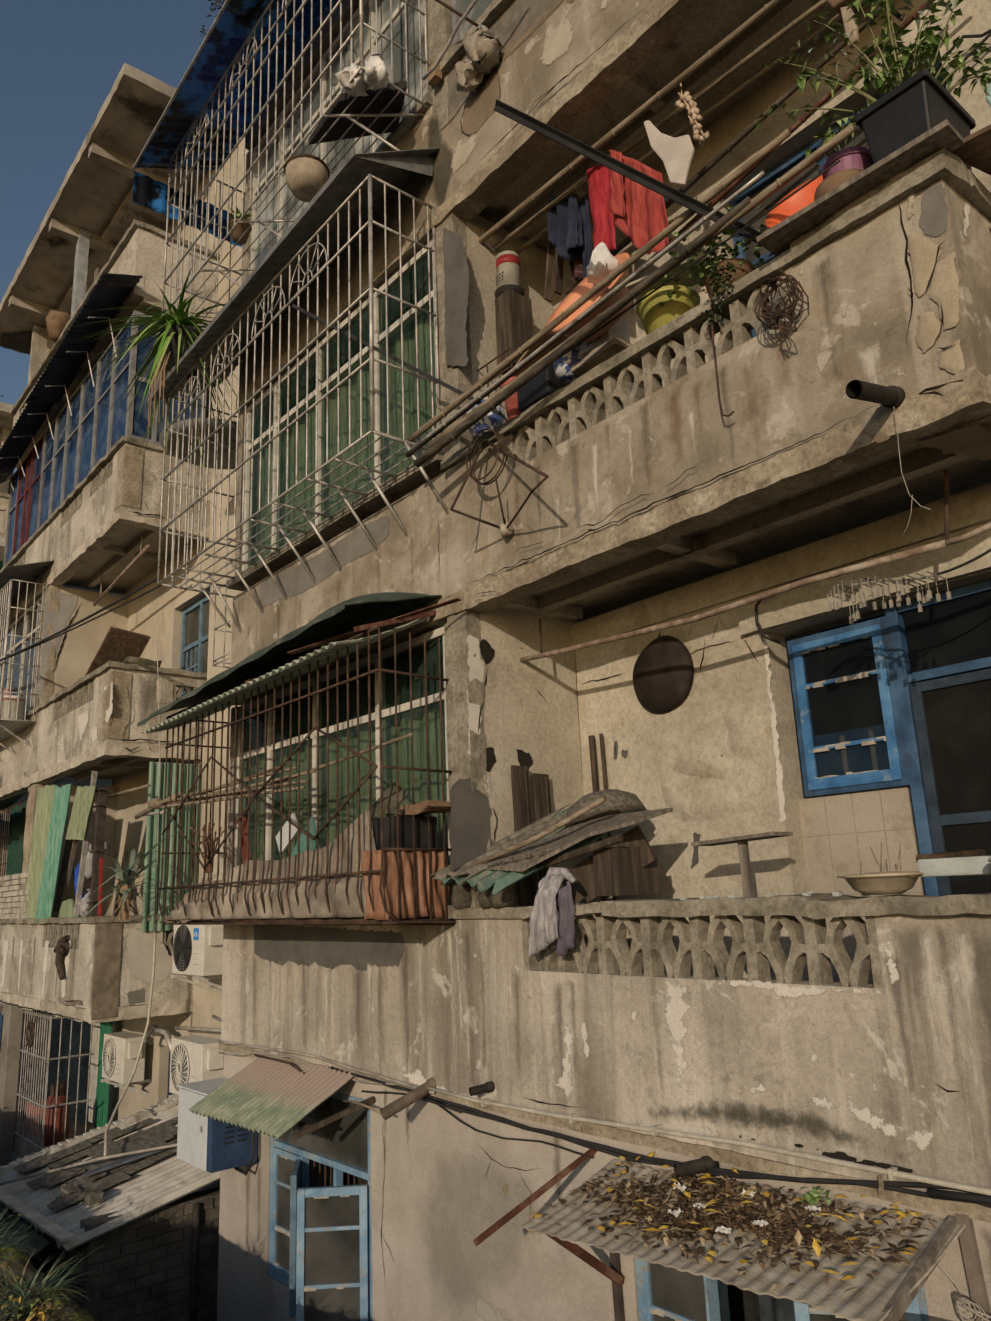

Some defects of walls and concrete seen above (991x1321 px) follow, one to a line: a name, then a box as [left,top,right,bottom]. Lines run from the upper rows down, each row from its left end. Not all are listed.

peeling [451,0,574,173]
crack [898,202,955,350]
peeling [466,635,496,798]
spalling [516,749,533,769]
peeling [719,940,899,998]
peeling [556,1023,590,1098]
peeling [665,980,690,1087]
peeling [810,1072,934,1150]